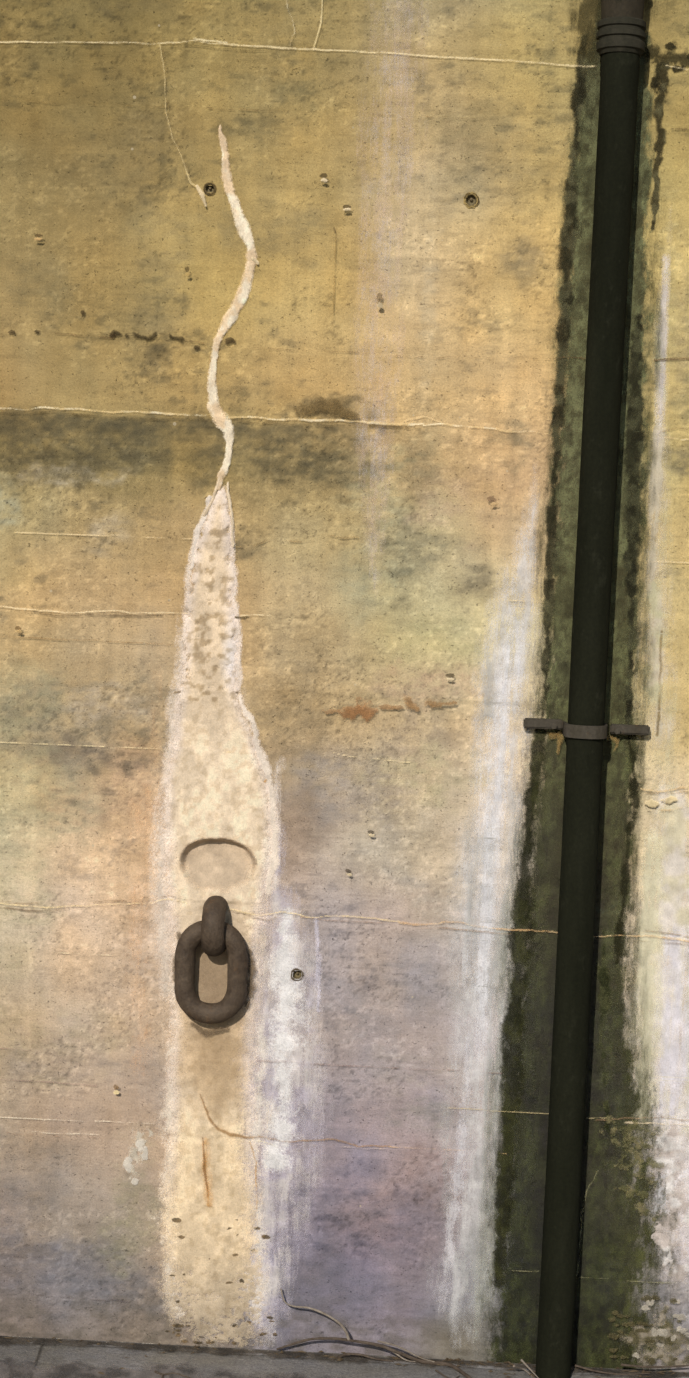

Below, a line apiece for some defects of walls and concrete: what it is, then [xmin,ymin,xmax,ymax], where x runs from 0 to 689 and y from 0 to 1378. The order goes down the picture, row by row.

water stain [651,63,671,230]
water stain [153,488,319,1347]
corrosion [244,949,256,1007]
water stain [446,0,601,1316]
water stain [597,275,689,1281]